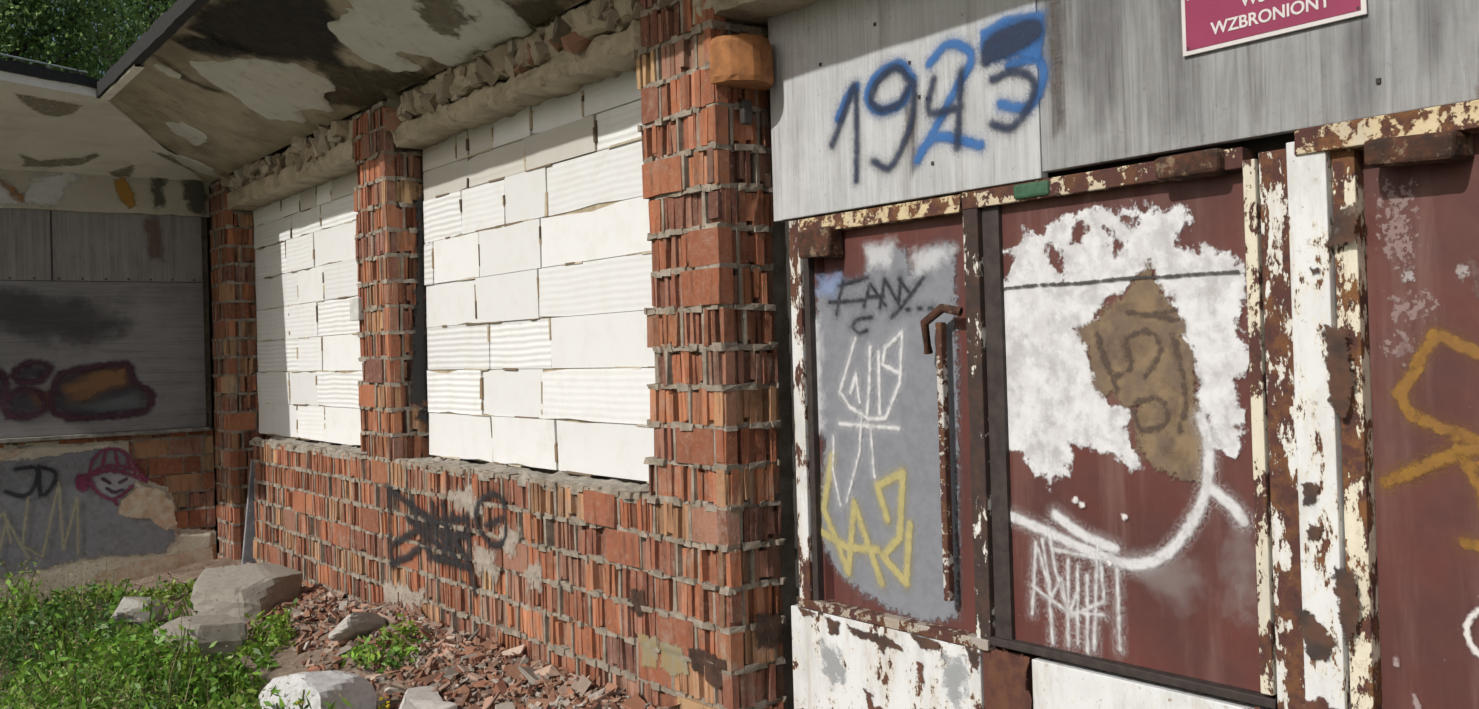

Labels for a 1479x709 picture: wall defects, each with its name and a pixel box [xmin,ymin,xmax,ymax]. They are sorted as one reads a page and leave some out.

peeling [154,58,350,189]
leakage [174,0,436,109]
peeling [327,0,592,131]
spalling [595,0,674,31]
leakage [151,178,208,215]
peeling [0,440,216,601]